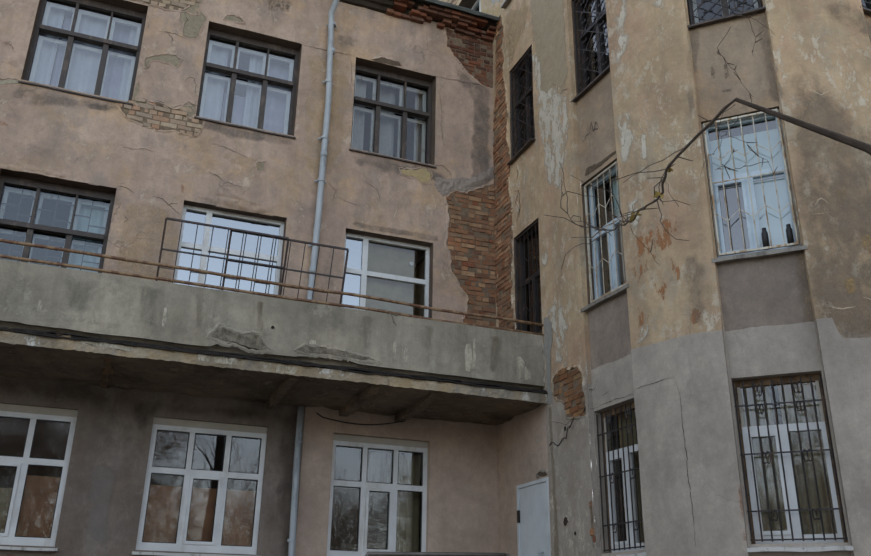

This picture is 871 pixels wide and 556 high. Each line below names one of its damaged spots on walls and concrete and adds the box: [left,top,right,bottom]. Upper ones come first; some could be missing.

peeling [131,0,209,41]
peeling [613,0,627,60]
flaking render [115,81,206,138]
peeling [532,55,569,187]
flaking render [386,0,515,329]
peeling [81,341,134,351]
spalling [198,323,274,365]
spalling [293,342,382,367]
flaking render [548,304,588,421]
crack [590,379,696,544]